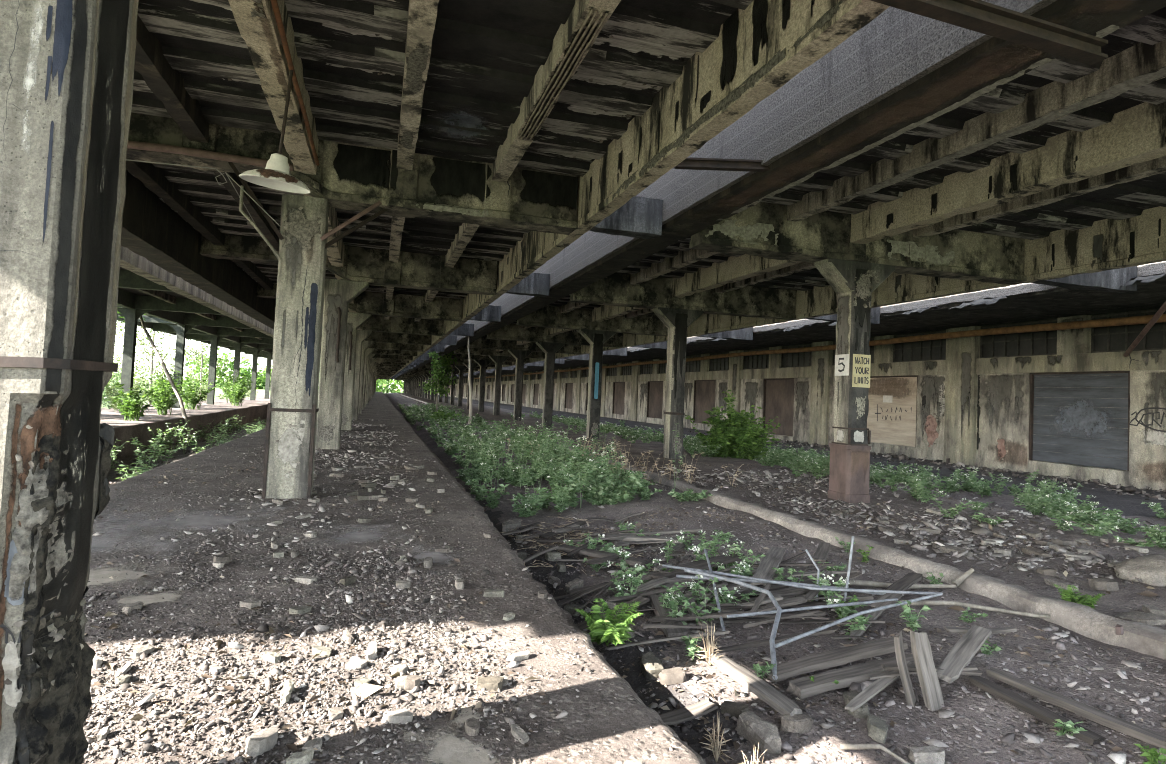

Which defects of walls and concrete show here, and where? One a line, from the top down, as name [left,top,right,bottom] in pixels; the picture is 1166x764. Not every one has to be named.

peeling [190,0,232,11]
peeling [322,23,392,40]
peeling [326,63,395,76]
leakage [695,0,768,114]
leakage [782,0,790,30]
leakage [521,127,642,210]
leakage [920,361,945,437]
leakage [961,352,1031,450]
leakage [1142,351,1166,435]
spalling [94,436,113,519]
rust [0,404,62,730]
spalling [2,425,95,764]